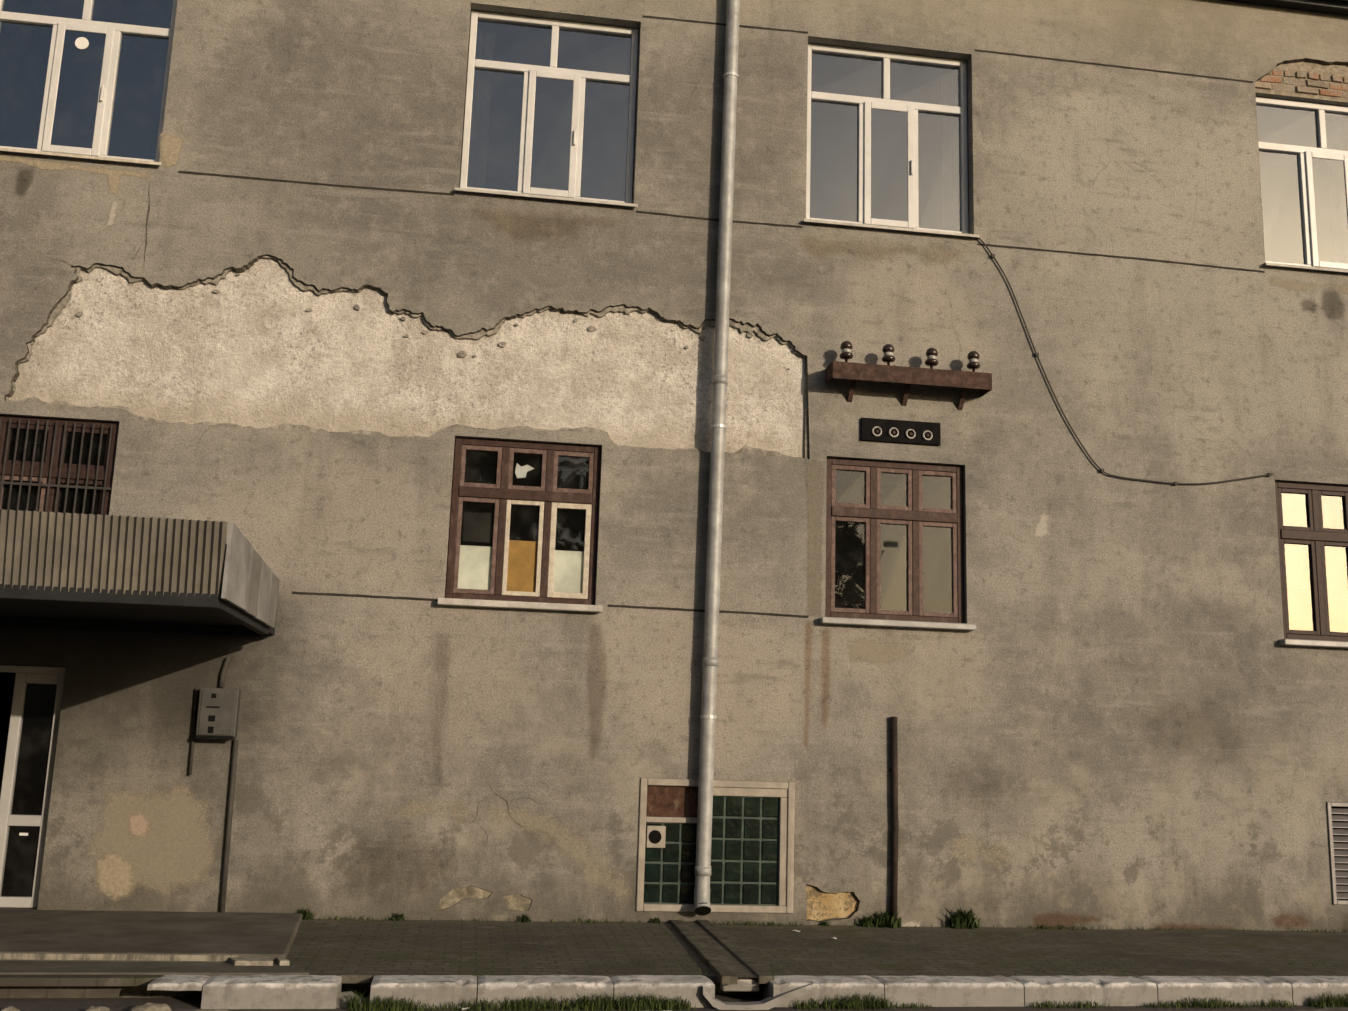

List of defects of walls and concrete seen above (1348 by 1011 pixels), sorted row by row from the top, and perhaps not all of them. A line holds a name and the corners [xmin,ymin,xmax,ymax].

flaking render [1255,58,1348,103]
spalling [4,254,810,459]
spalling [436,885,533,911]
spalling [806,884,860,922]